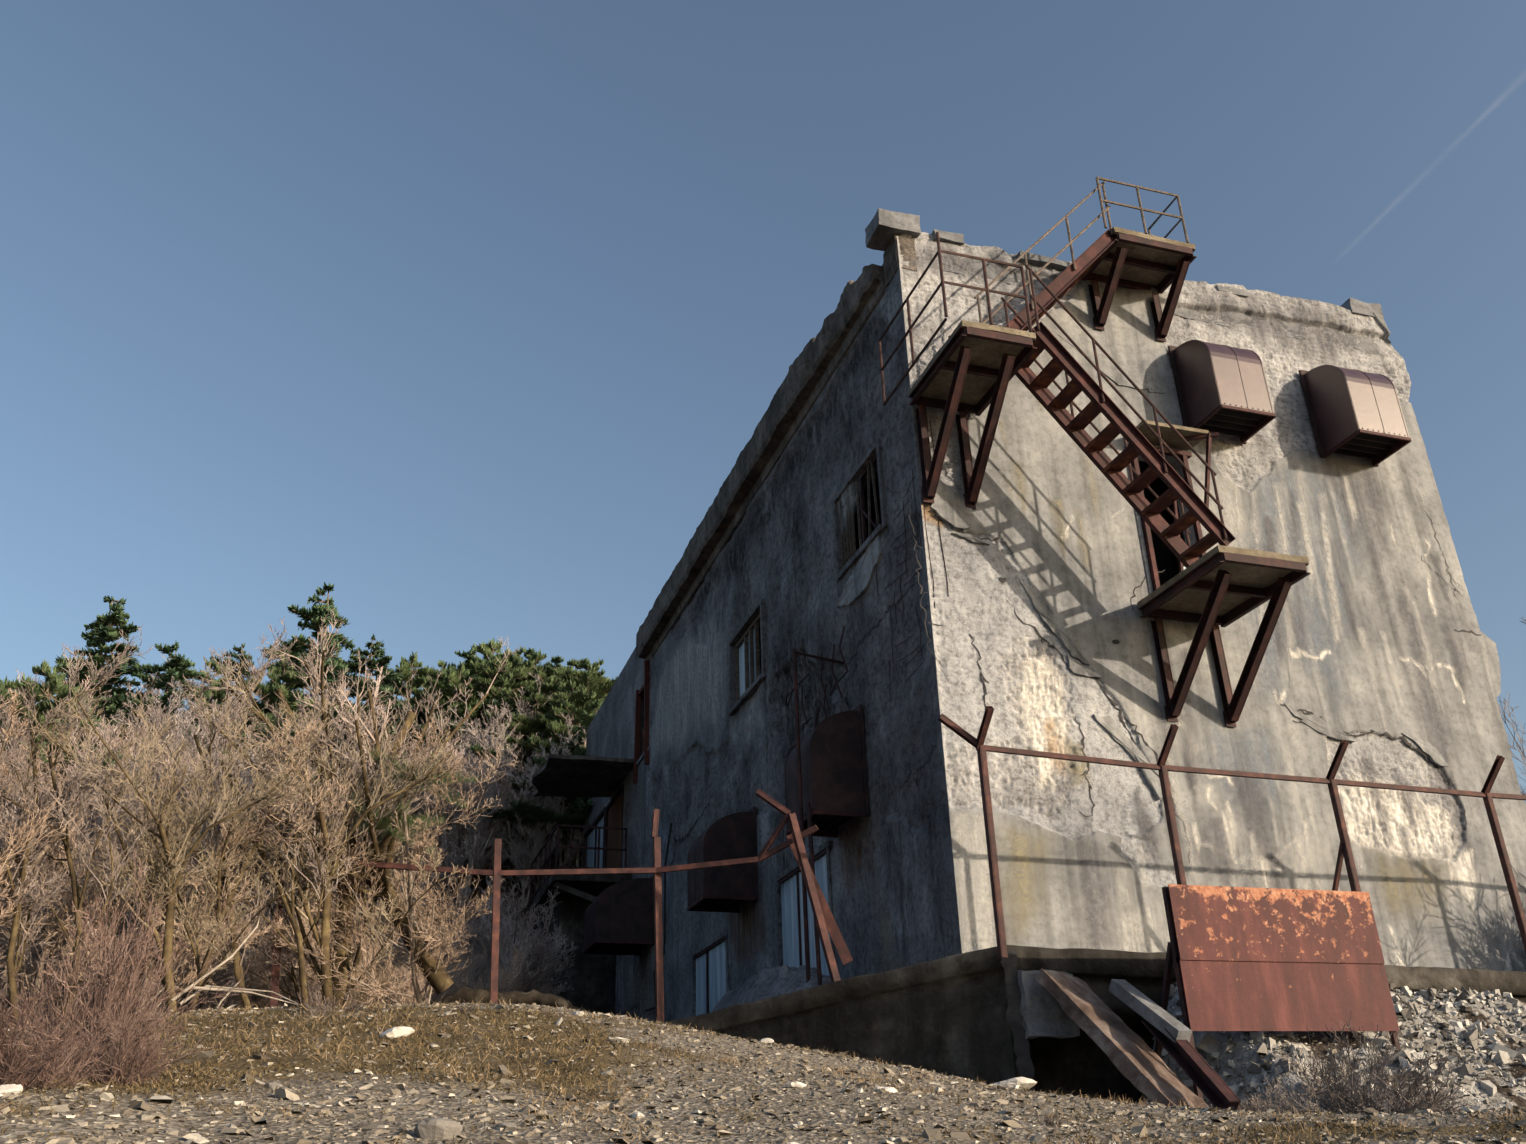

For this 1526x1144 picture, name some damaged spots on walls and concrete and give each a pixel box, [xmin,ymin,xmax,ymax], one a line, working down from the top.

spalling [1056,280,1411,492]
spalling [647,232,1177,887]
crack [1131,570,1165,610]
crack [1007,601,1191,864]
spalling [1284,703,1467,862]